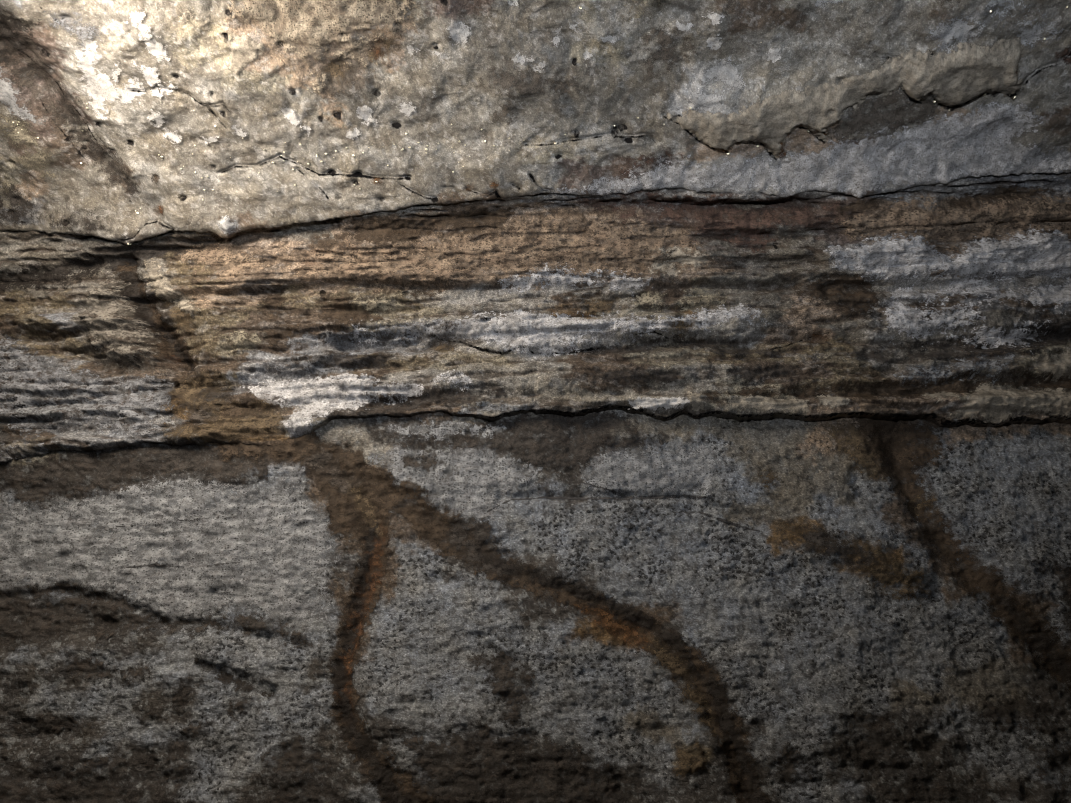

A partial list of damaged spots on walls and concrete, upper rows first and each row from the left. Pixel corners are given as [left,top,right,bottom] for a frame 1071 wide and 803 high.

crack [901,53,1071,111]
crack [118,221,174,242]
crack [462,404,1070,426]
damp [0,227,1071,803]